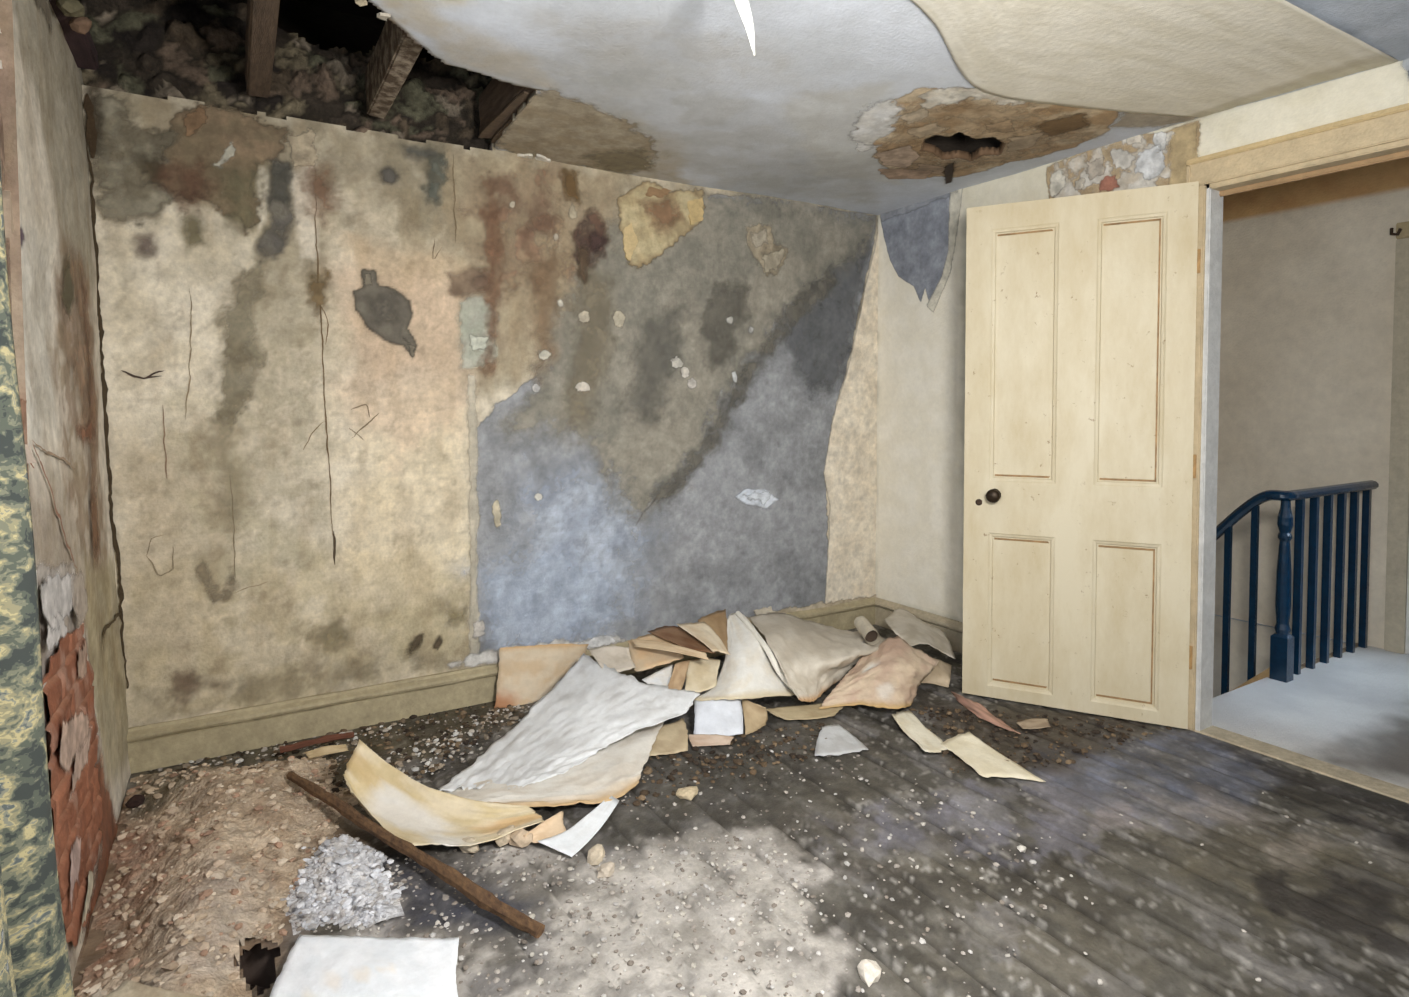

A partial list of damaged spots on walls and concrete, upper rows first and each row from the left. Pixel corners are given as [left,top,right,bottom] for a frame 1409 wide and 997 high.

water stain [83,81,177,255]
crack [30,93,266,689]
spalling [151,102,318,235]
water stain [217,160,294,429]
crack [303,166,336,565]
water stain [449,267,493,296]
peeling [460,297,497,368]
water stain [496,90,658,174]
peeling [617,181,705,268]
water stain [509,193,878,513]
spalling [849,87,1201,199]
spalling [36,562,118,961]